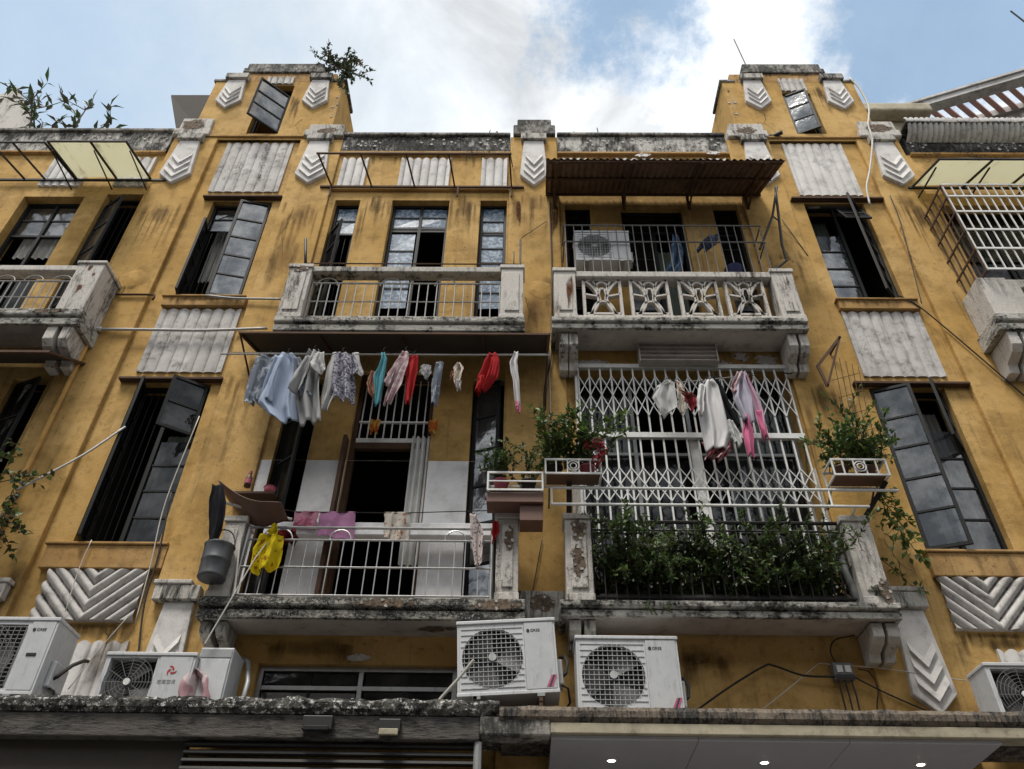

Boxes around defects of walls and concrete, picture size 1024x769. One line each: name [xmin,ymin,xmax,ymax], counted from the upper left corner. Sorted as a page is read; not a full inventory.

spalling [504,526,515,551]
spalling [570,519,587,577]